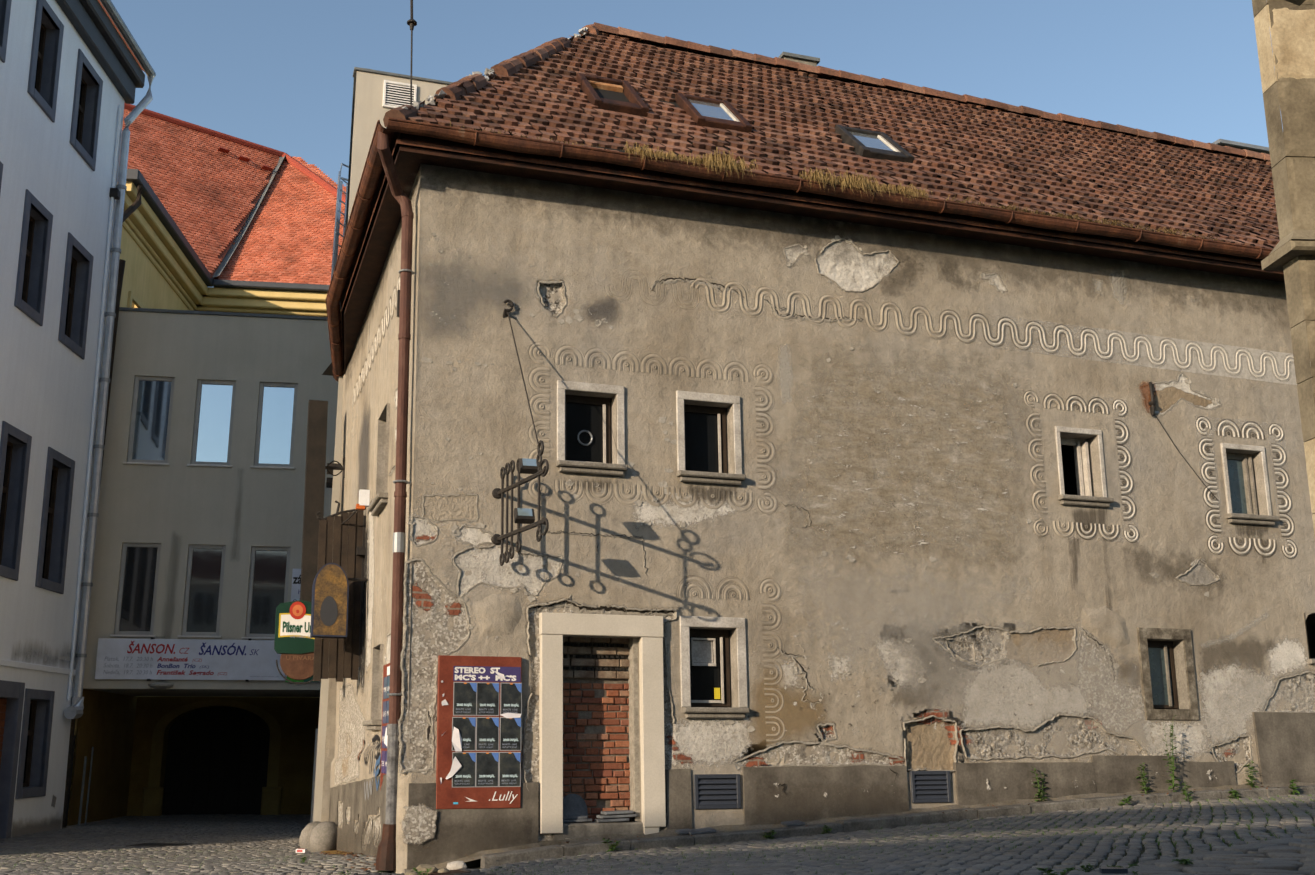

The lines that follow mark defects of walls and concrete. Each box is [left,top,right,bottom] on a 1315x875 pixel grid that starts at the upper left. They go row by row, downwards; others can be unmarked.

peeling [783,236,899,293]
leakage [588,301,615,319]
peeling [1139,371,1222,416]
peeling [627,461,738,529]
spalling [335,493,755,848]
spalling [774,600,1308,773]